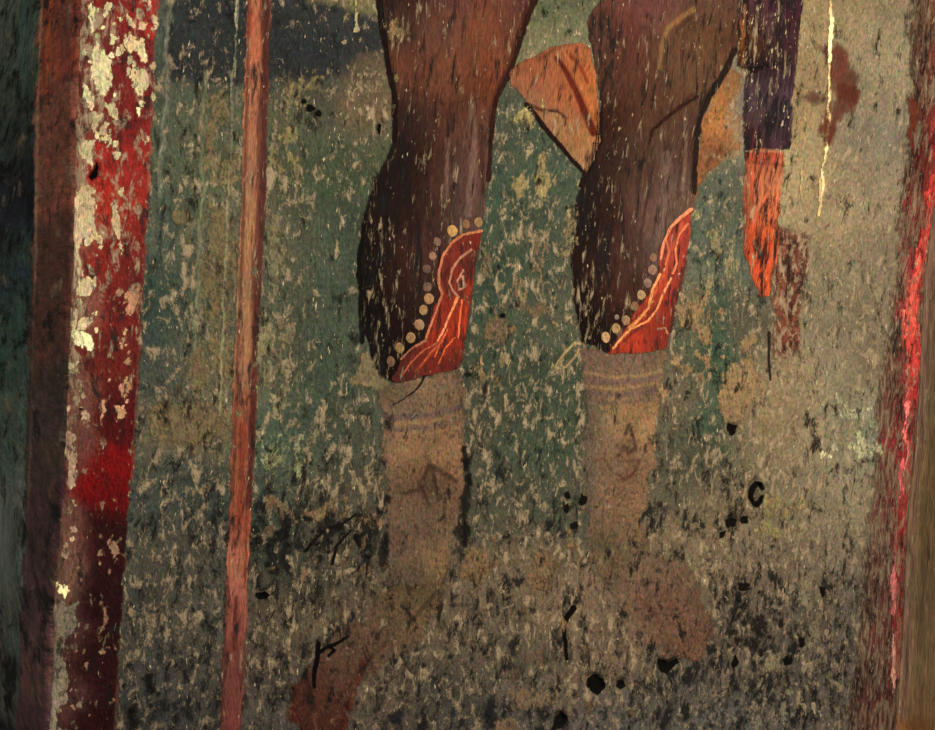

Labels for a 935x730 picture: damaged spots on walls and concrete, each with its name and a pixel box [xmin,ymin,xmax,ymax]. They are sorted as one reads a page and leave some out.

peeling [135,200,242,455]
peeling [64,376,133,514]
peeling [60,526,77,560]
peeling [98,534,122,574]